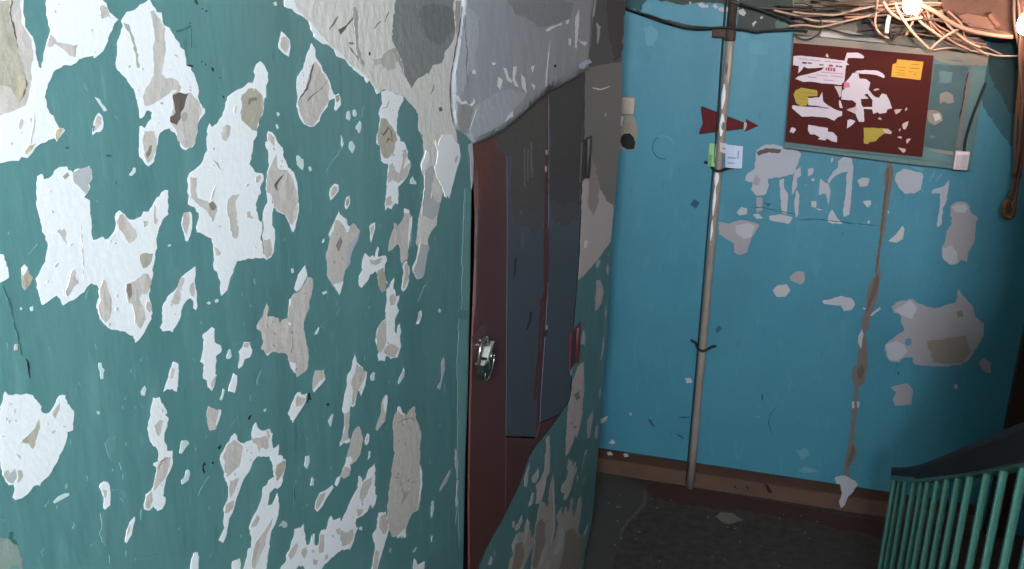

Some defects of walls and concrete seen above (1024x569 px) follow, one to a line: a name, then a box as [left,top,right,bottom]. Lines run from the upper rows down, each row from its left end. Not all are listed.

peeling [0,0,312,343]
peeling [710,144,871,255]
flaking render [895,169,978,265]
flaking render [200,0,474,569]
crack [756,162,893,477]
flaking render [884,289,991,373]
peeling [0,392,74,500]
peeling [99,481,111,509]
peeling [125,362,189,543]
flaking render [508,362,608,569]
flaking render [0,538,23,569]
peeling [190,552,199,569]